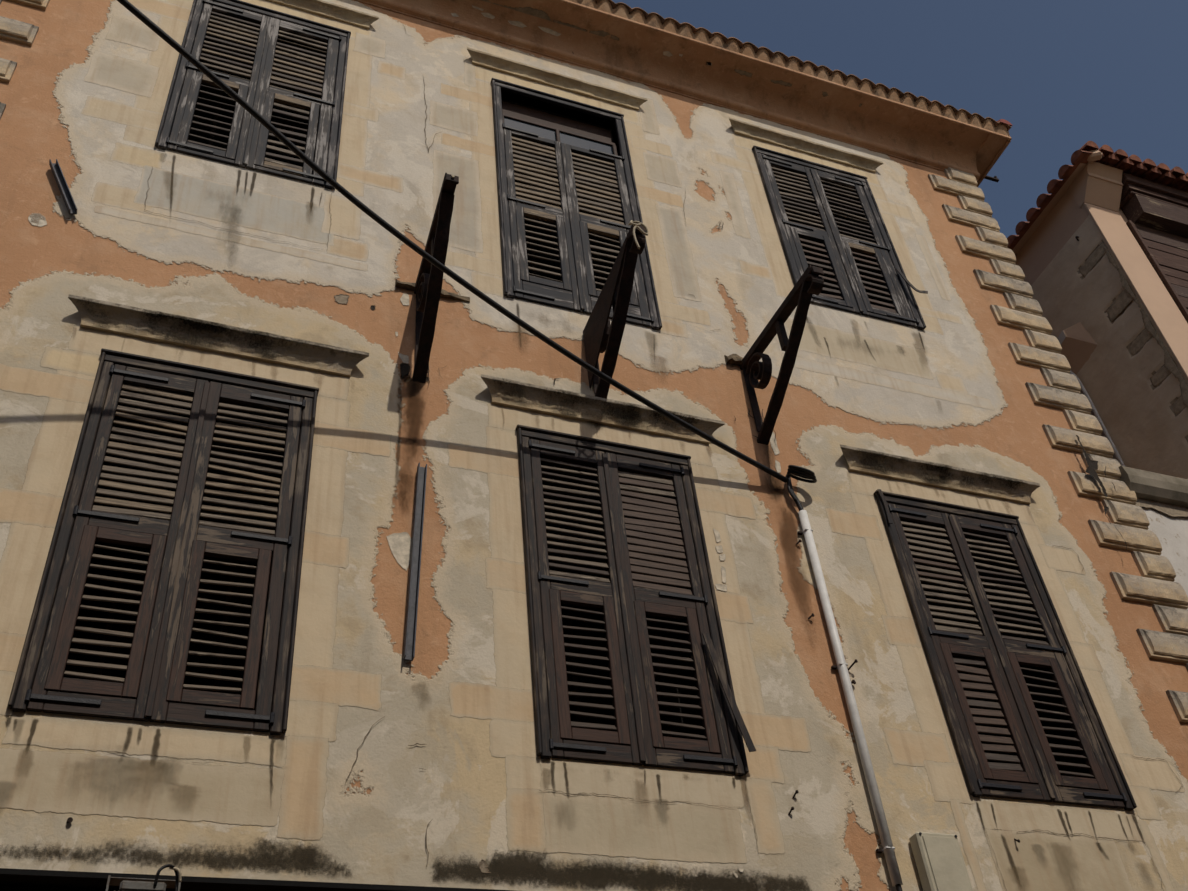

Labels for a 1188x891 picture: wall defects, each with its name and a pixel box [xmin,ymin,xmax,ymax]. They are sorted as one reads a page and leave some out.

water stain [237,170,256,193]
peeling [322,0,1008,431]
rust [408,383,422,439]
peeling [0,0,897,891]
peeling [796,424,1188,891]
water stain [125,728,161,762]
water stain [551,762,568,792]
mould [0,840,349,873]
mould [434,852,810,891]